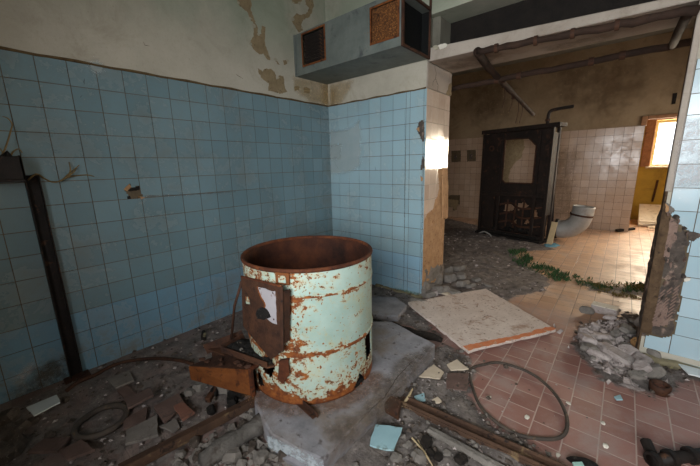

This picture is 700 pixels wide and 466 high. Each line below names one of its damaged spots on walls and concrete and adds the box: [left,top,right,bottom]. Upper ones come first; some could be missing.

peeling [237,0,314,94]
flaking render [421,168,449,299]
spalling [630,203,700,349]